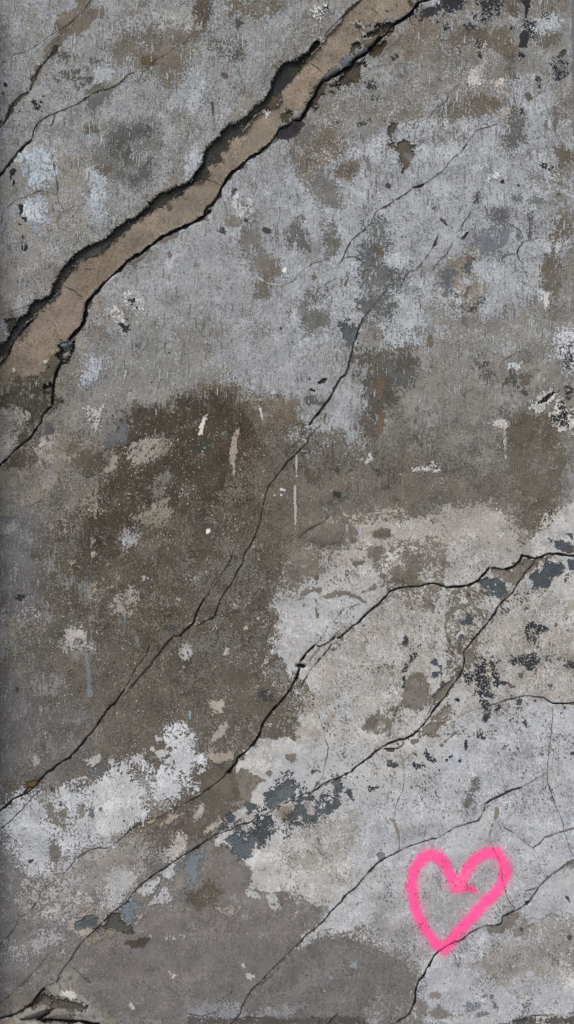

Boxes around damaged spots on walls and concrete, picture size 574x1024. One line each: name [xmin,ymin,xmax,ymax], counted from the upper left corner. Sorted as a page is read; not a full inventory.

crack [0,0,429,466]
crack [289,124,497,285]